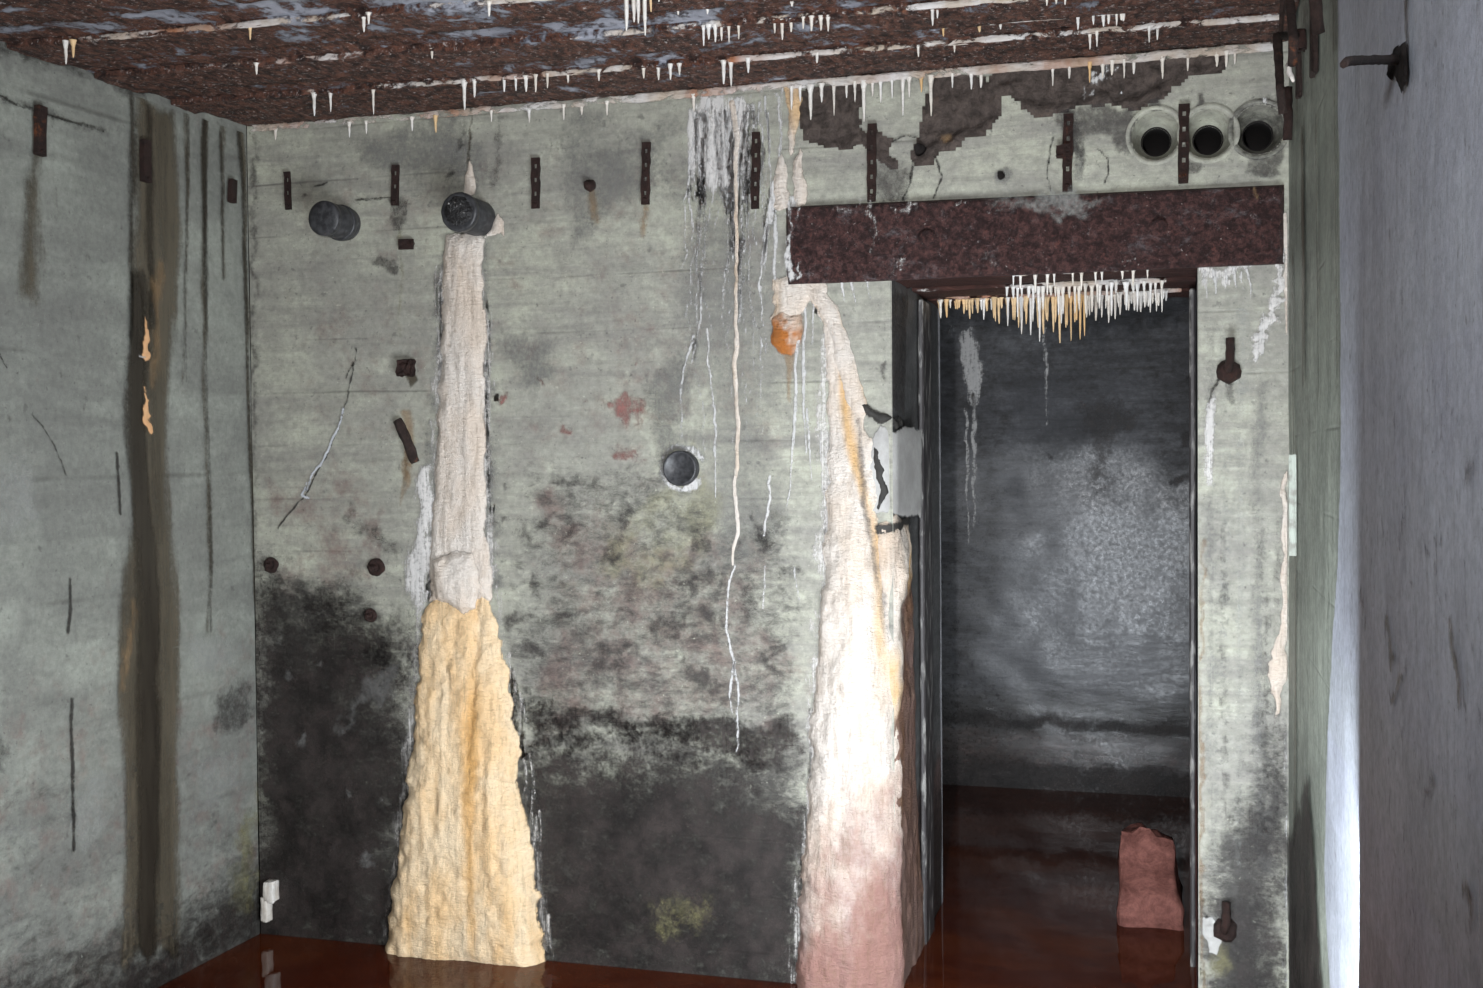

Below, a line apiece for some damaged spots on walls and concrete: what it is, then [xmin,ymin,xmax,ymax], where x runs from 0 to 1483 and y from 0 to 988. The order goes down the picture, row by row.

damp [62,12,372,64]
crack [1,96,104,132]
spalling [799,55,1226,170]
damp [21,155,41,295]
crack [278,348,357,528]
damp [118,0,1282,988]
damp [1200,472,1321,988]